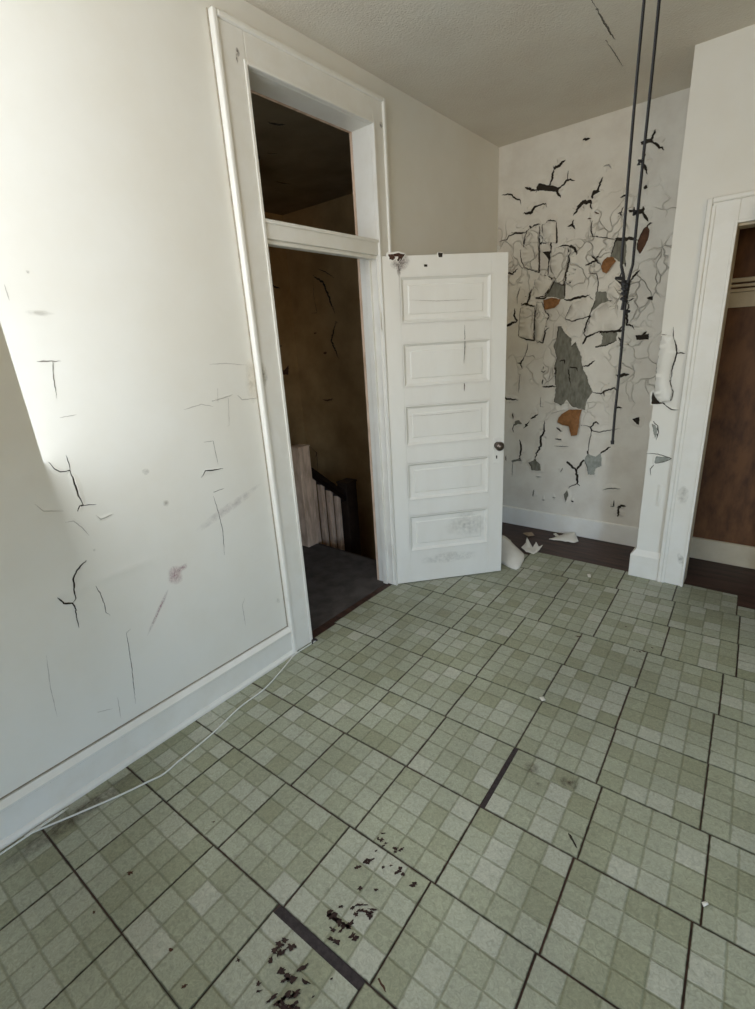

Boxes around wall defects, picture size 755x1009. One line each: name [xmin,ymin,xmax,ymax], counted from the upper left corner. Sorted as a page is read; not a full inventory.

crack [588,0,624,67]
peeling [536,242,568,310]
peeling [551,204,658,436]
crack [37,360,74,418]
spalling [628,390,679,428]
crack [34,456,113,536]
spalling [504,413,526,476]
peeling [560,447,610,505]
spalling [647,451,673,475]
crack [58,560,108,627]
crack [100,633,136,717]